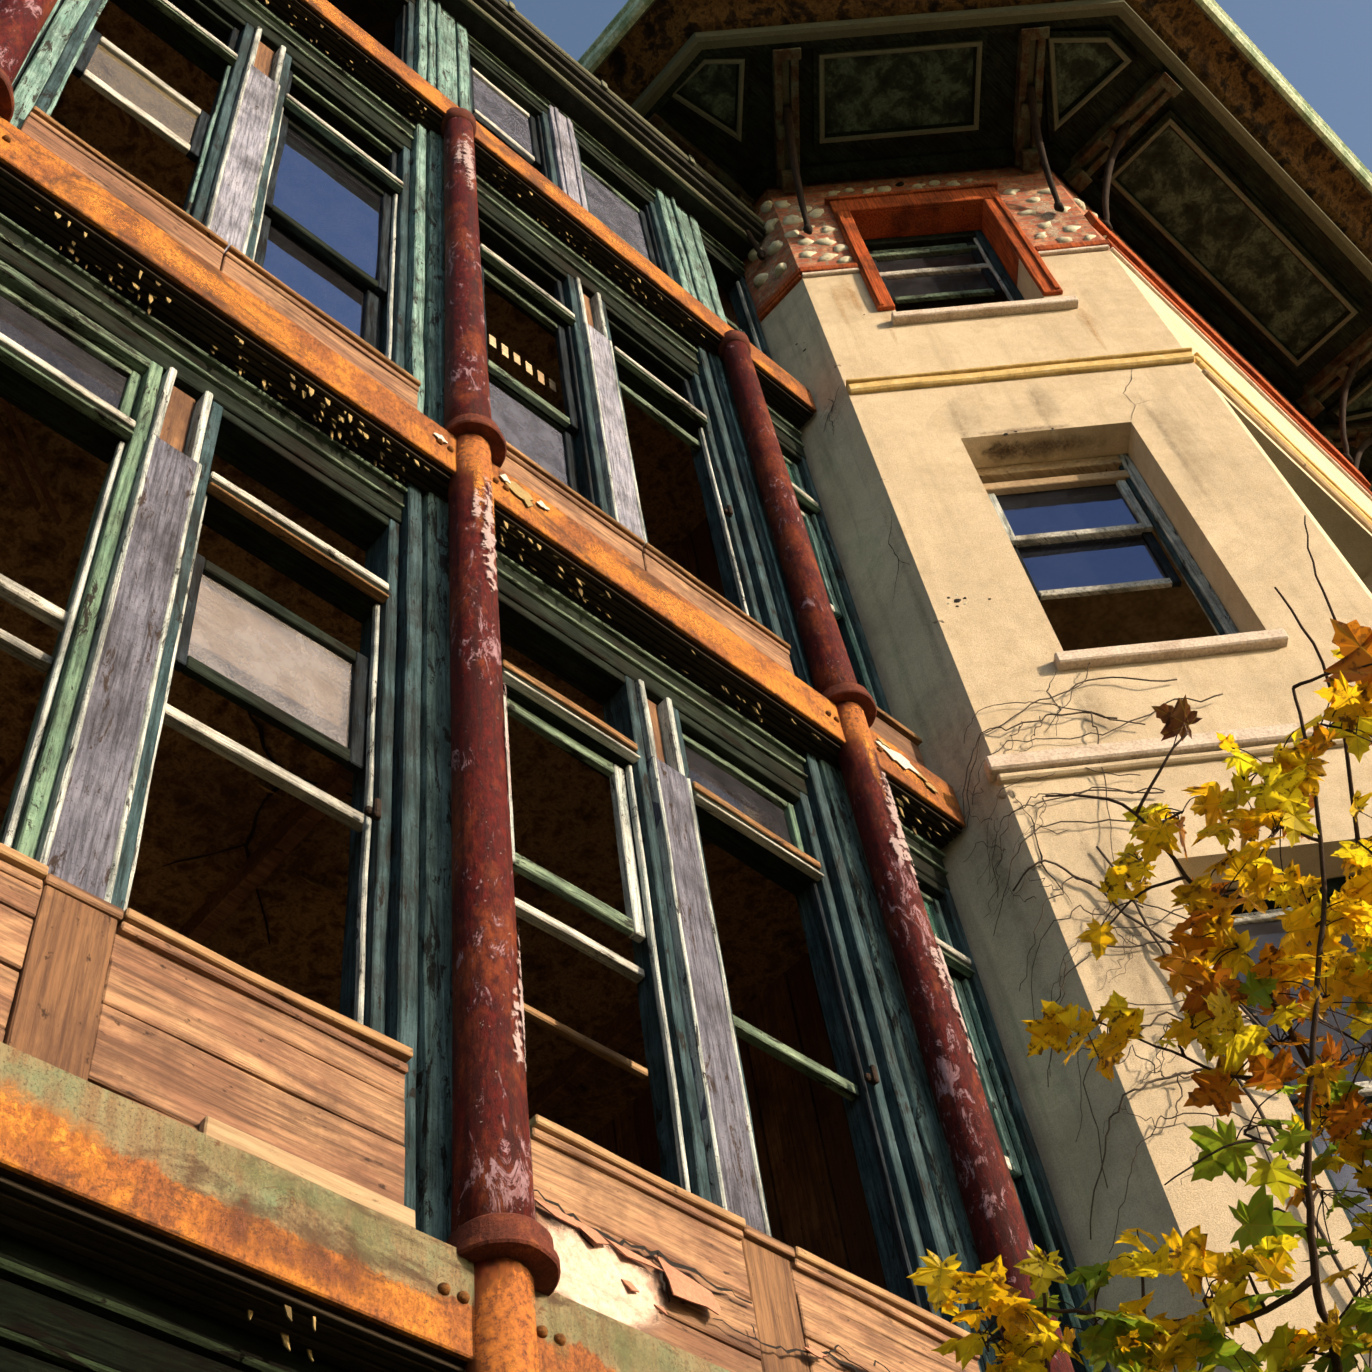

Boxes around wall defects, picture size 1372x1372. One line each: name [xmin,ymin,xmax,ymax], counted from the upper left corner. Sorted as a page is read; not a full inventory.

corrosion [137,229,290,340]
corrosion [456,438,494,506]
corrosion [841,705,924,782]
peeling [875,738,950,886]
peeling [931,936,981,1078]
corrosion [0,1091,101,1162]
corrosion [472,1268,539,1372]
peeling [534,1198,721,1326]
crack [534,1189,890,1372]